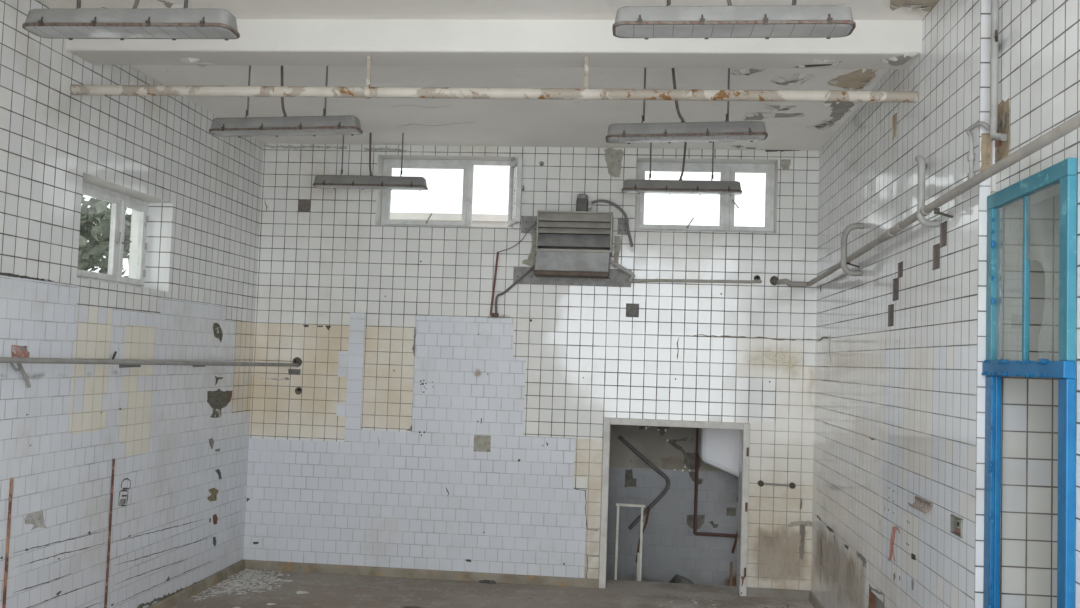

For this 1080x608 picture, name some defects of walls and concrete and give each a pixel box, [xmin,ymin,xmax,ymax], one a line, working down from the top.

peeling [888,0,938,12]
peeling [732,52,920,130]
flaking render [980,98,1010,172]
spalling [868,584,885,608]